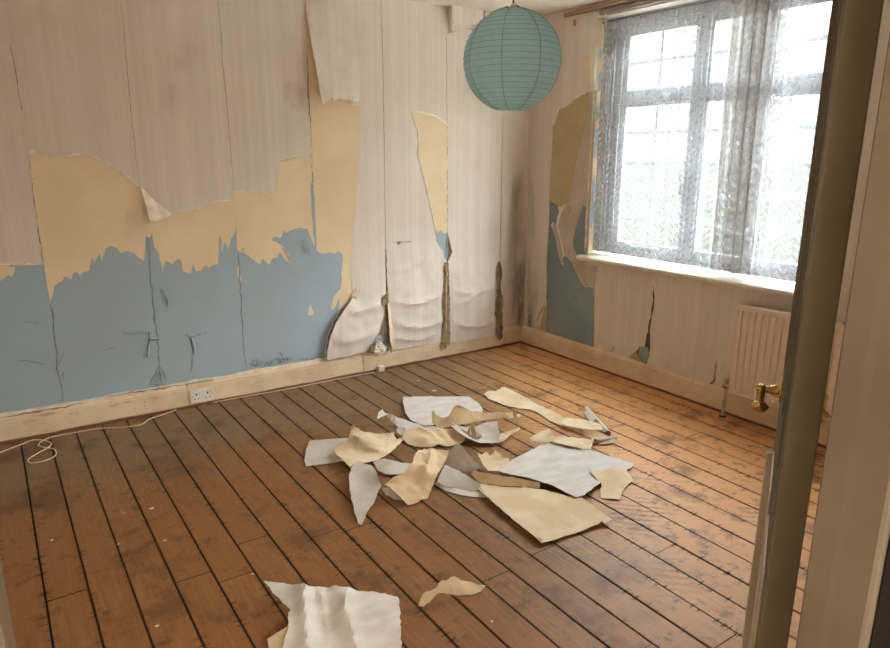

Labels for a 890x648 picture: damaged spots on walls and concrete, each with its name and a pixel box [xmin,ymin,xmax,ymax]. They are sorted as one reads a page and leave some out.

crack [107,262,206,397]